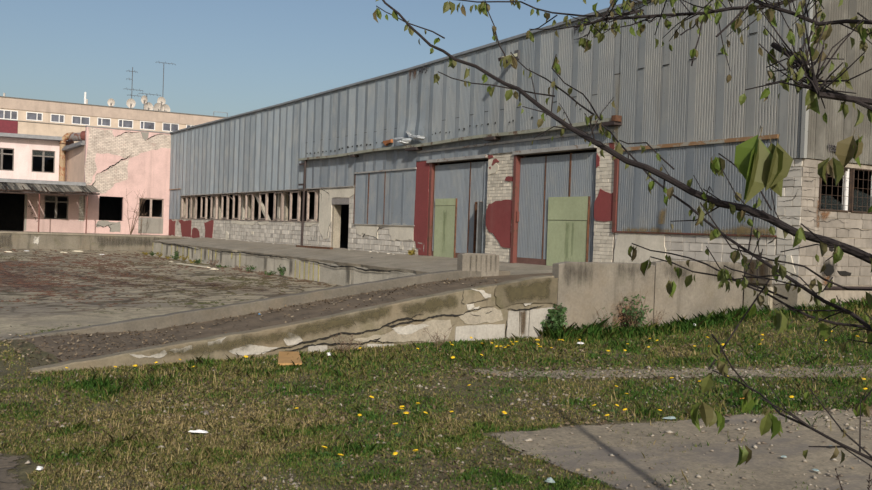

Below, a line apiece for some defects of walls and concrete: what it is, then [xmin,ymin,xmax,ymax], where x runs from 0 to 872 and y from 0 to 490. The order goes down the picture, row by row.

peeling [84,127,171,193]
peeling [169,219,214,238]
peeling [305,187,354,239]
peeling [486,200,512,248]
peeling [594,189,613,222]
crack [263,290,543,355]